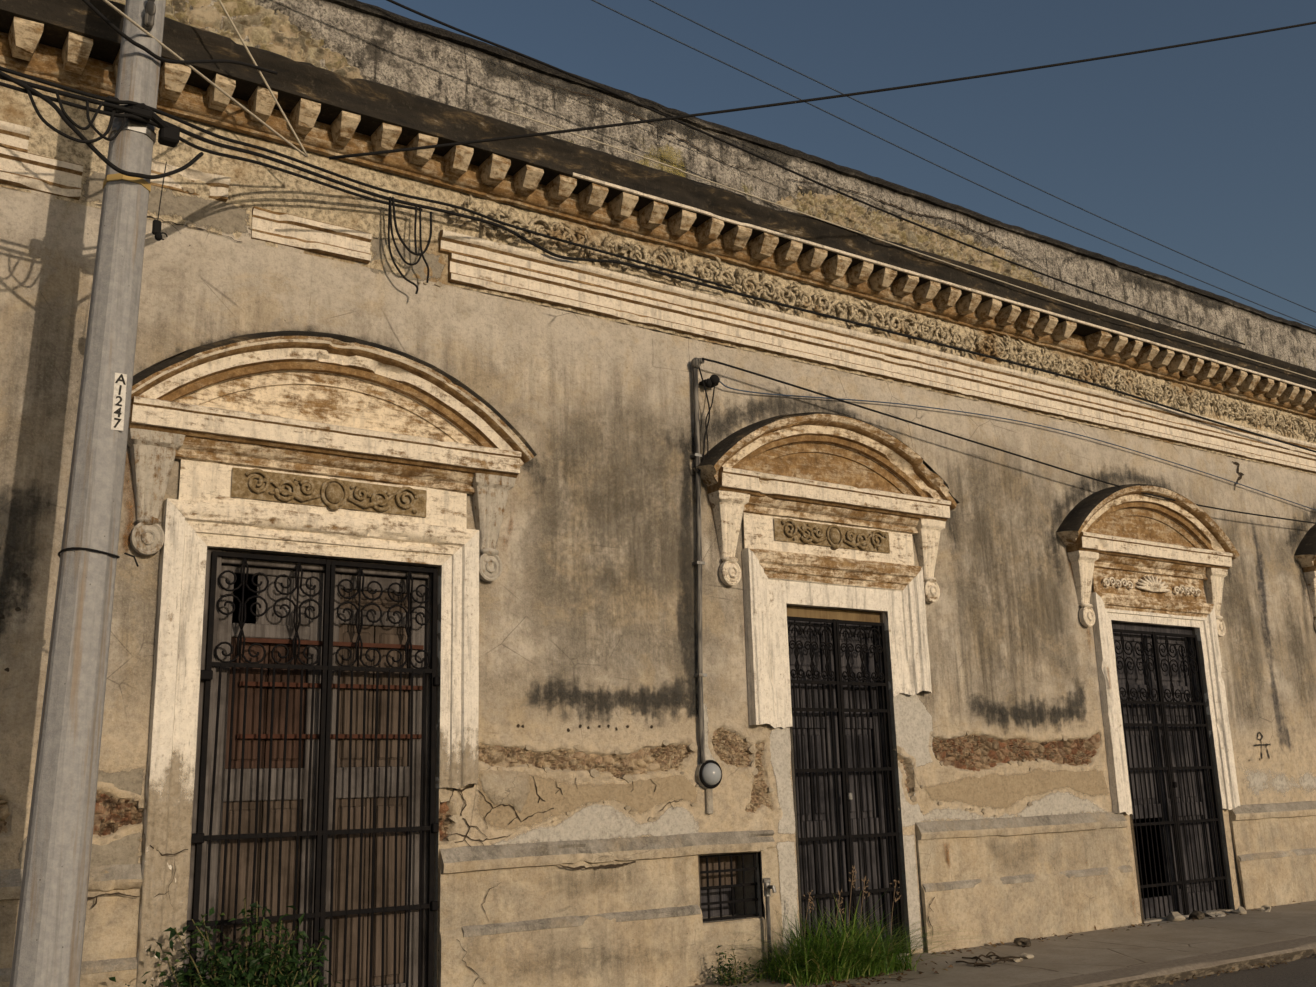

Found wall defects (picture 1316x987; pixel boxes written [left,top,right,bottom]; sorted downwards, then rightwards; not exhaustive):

damp [0,480,50,635]
damp [530,392,855,721]
damp [743,495,919,535]
damp [1254,532,1270,643]
damp [972,687,1085,728]
peeling [90,751,194,987]
crack [447,777,577,847]
peeling [435,704,801,965]
flaking render [893,693,1108,949]